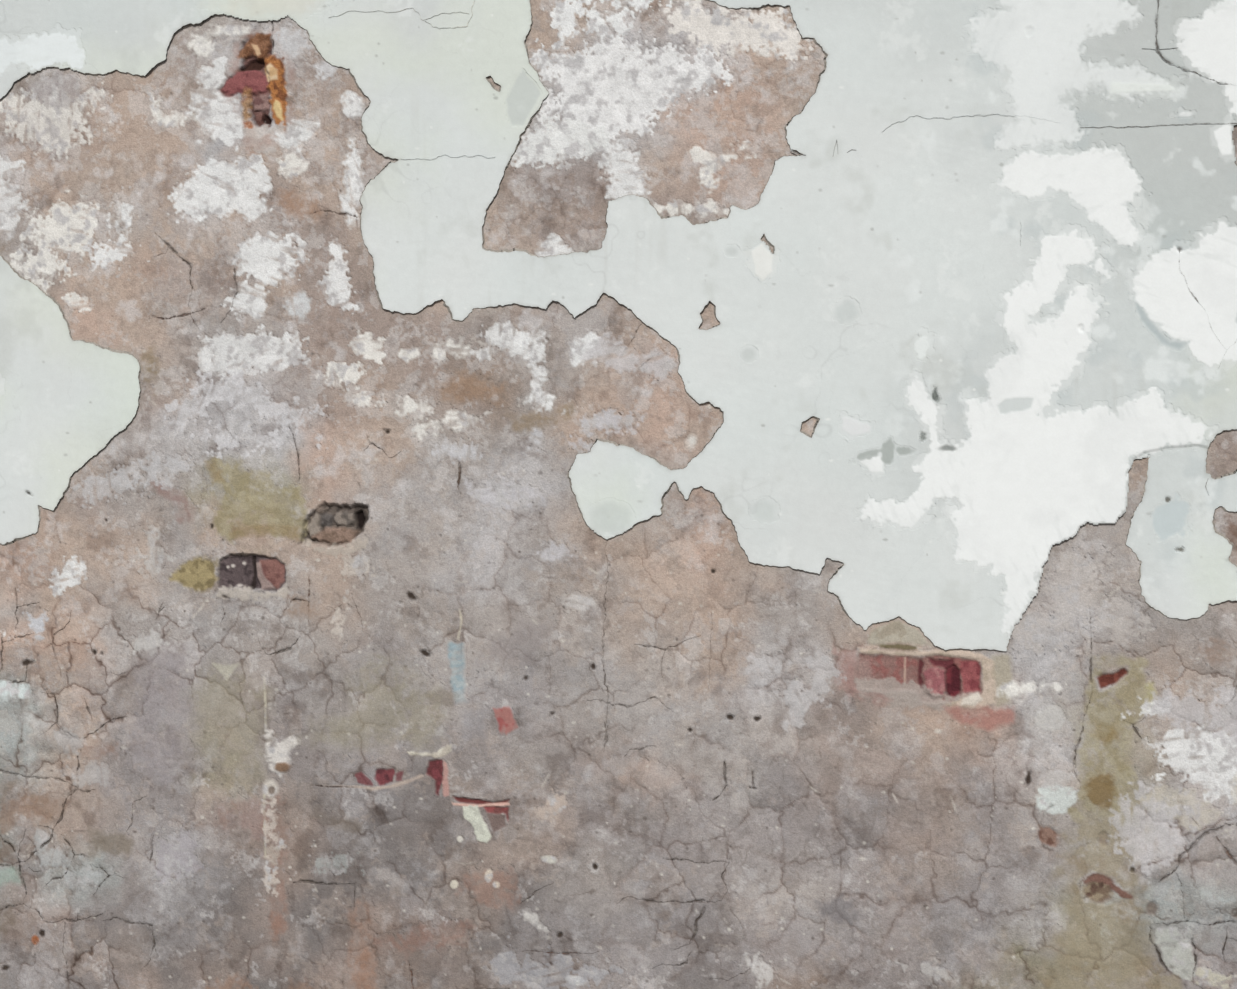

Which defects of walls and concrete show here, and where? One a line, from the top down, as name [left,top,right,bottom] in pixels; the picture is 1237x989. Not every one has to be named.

crack [1142,0,1235,86]
peeling [482,0,828,257]
crack [882,114,1237,132]
peeling [963,0,1237,253]
damp [0,238,18,258]
damp [260,183,333,228]
damp [139,341,163,399]
damp [434,367,581,436]
peeling [848,216,1237,640]
flaking render [857,652,982,696]
crack [0,589,158,988]
crack [1149,819,1237,989]